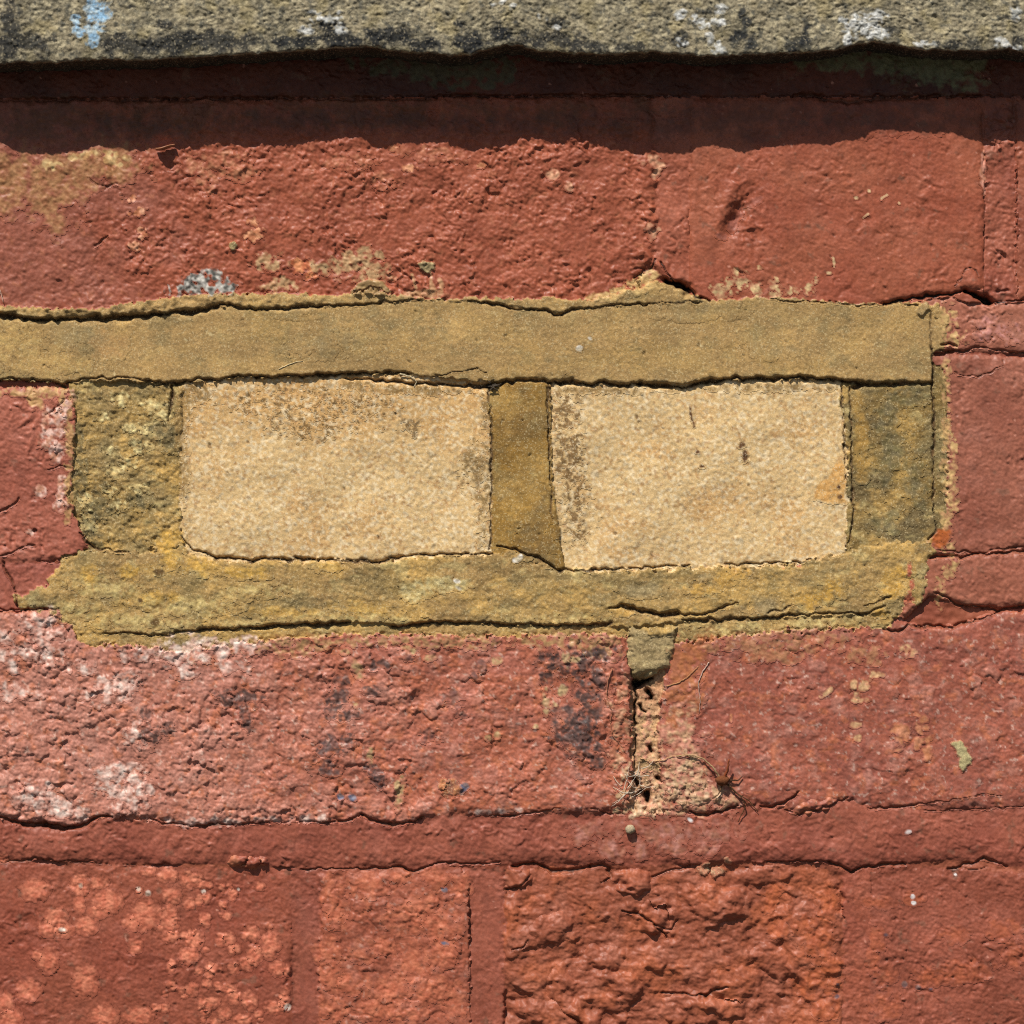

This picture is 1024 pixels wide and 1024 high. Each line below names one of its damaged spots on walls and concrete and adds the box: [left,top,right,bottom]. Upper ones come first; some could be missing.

peeling [163,267,243,298]
peeling [350,279,393,297]
peeling [34,388,77,514]
spalling [813,458,848,505]
peeling [604,628,748,831]